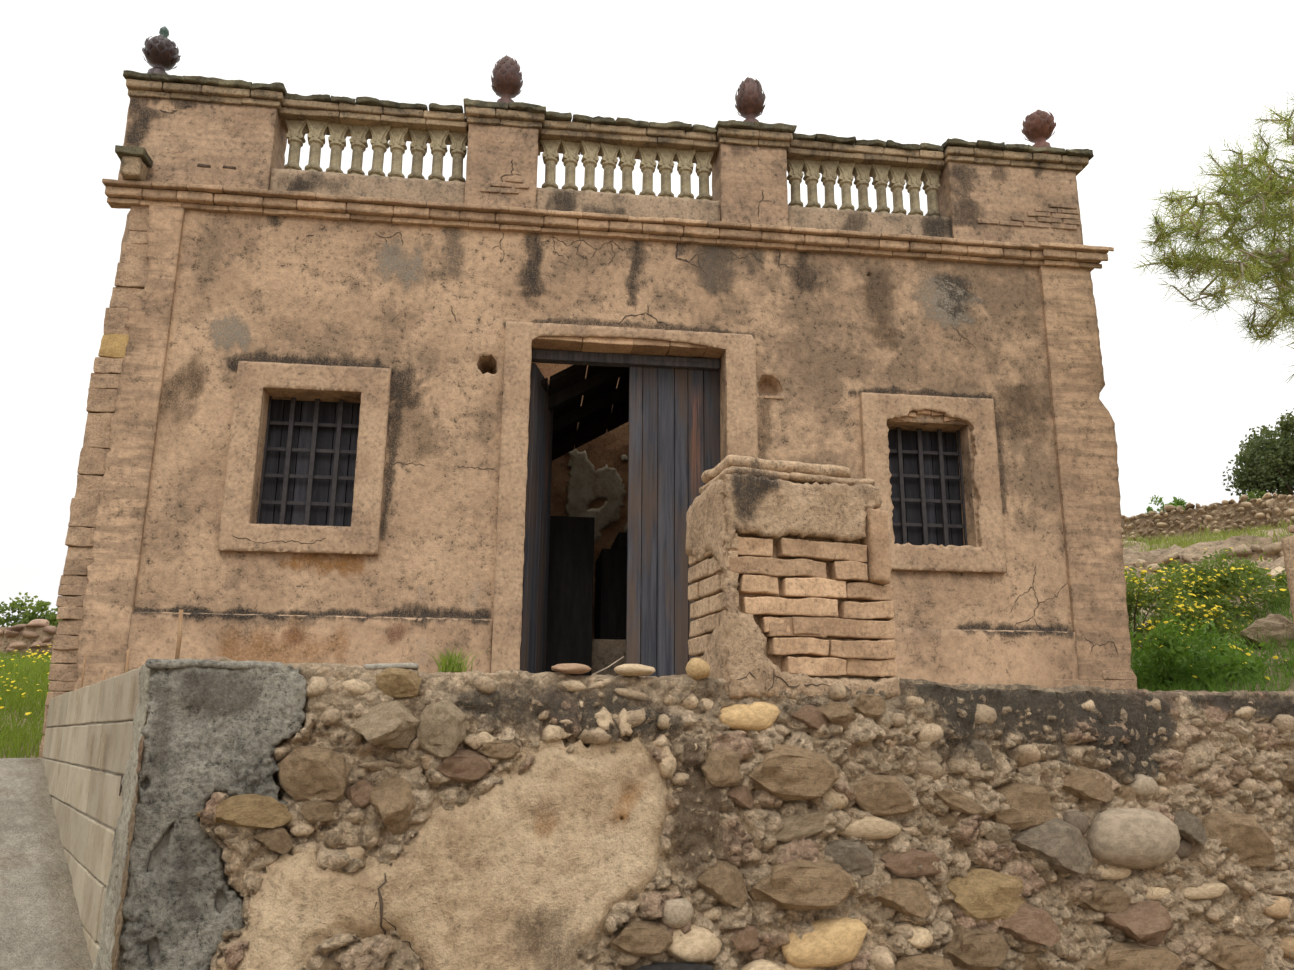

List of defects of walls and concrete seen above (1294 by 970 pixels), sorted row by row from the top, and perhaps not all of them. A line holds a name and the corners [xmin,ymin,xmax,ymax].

damp [521,233,544,296]
damp [626,240,642,305]
damp [698,245,750,294]
damp [227,353,419,539]
damp [732,400,780,518]
damp [133,605,491,624]
peeling [719,473,901,699]
crack [1009,566,1066,626]
damp [916,684,1177,777]
damp [1190,695,1294,719]
peeling [216,707,680,970]
crack [374,873,412,949]